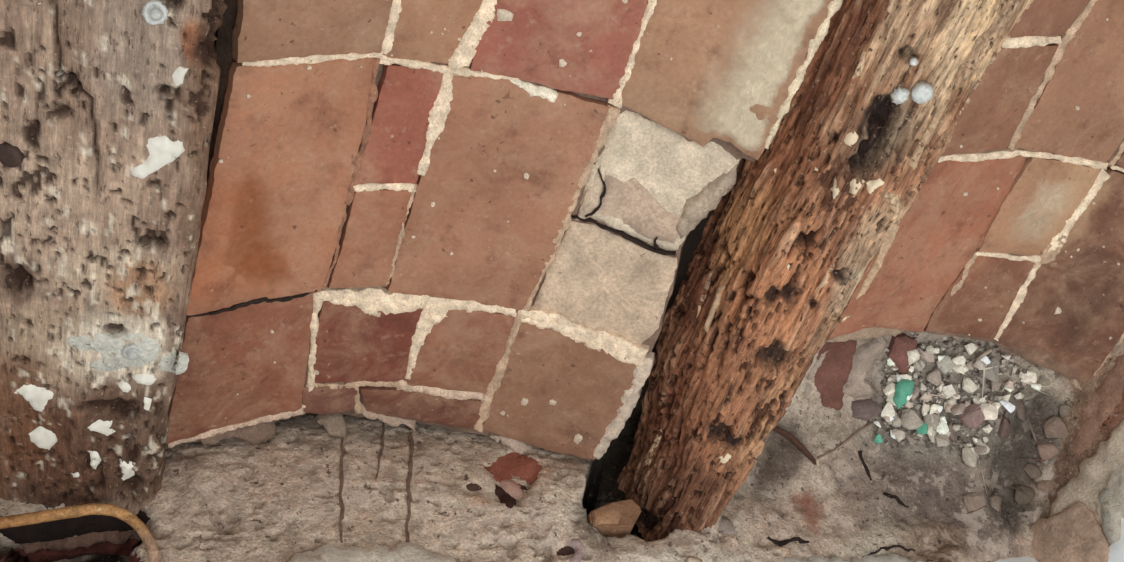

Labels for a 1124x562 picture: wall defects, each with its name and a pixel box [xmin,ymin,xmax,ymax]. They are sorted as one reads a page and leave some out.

crack [572,168,676,255]
spalling [803,327,905,420]
spalling [0,510,150,562]
crack [338,438,346,543]
crack [375,422,414,542]
spalling [556,538,587,562]
peeling [1031,463,1124,562]